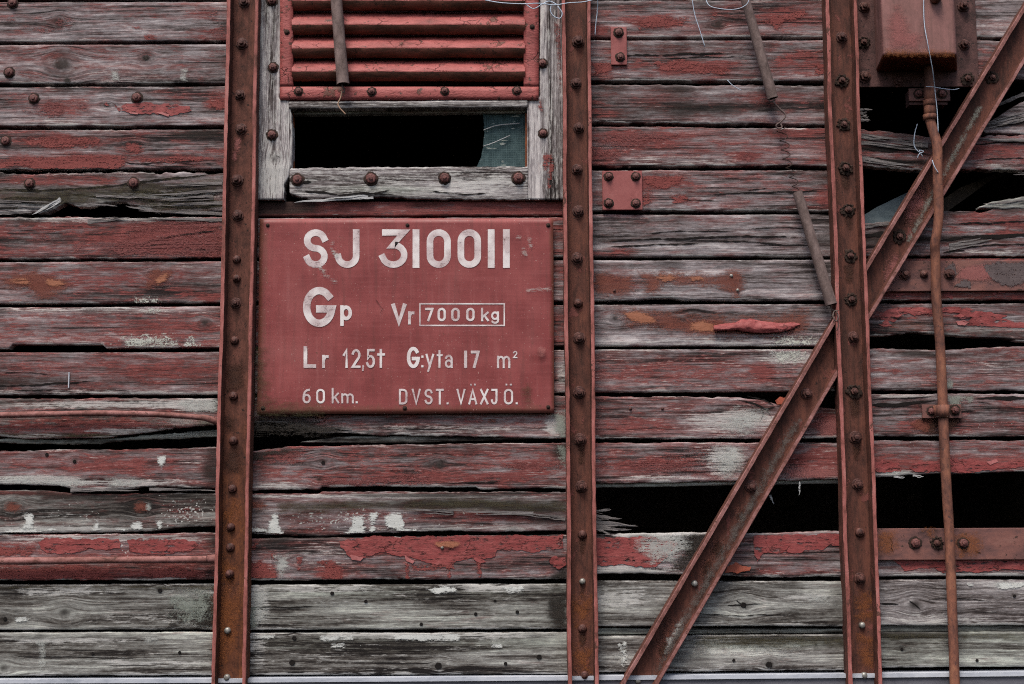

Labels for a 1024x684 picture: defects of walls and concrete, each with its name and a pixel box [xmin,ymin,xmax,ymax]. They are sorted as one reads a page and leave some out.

peeling [105,102,192,117]
crack [0,160,219,250]
rust [621,308,809,338]
peeling [690,318,800,333]
peeling [879,292,1024,328]
rust [911,418,960,433]
rust [783,468,836,477]
peeling [0,537,203,578]
peeling [339,534,564,565]
peeling [725,533,839,573]